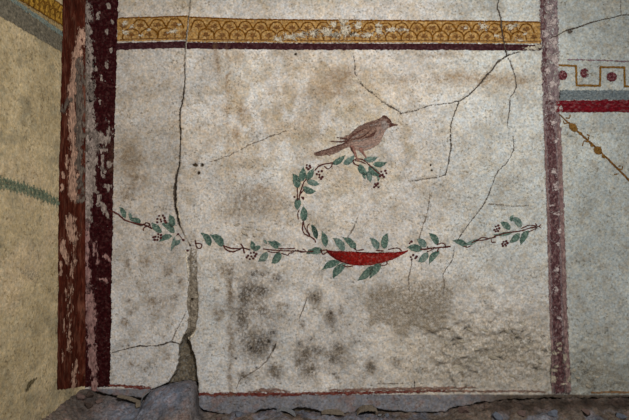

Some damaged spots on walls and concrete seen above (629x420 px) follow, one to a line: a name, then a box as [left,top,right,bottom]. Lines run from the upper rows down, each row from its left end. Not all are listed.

peeling [274,17,409,43]
crack [551,1,629,38]
peeling [58,0,114,392]
crack [173,0,190,227]
crack [210,130,286,162]
crack [348,0,527,289]
crack [109,248,199,395]